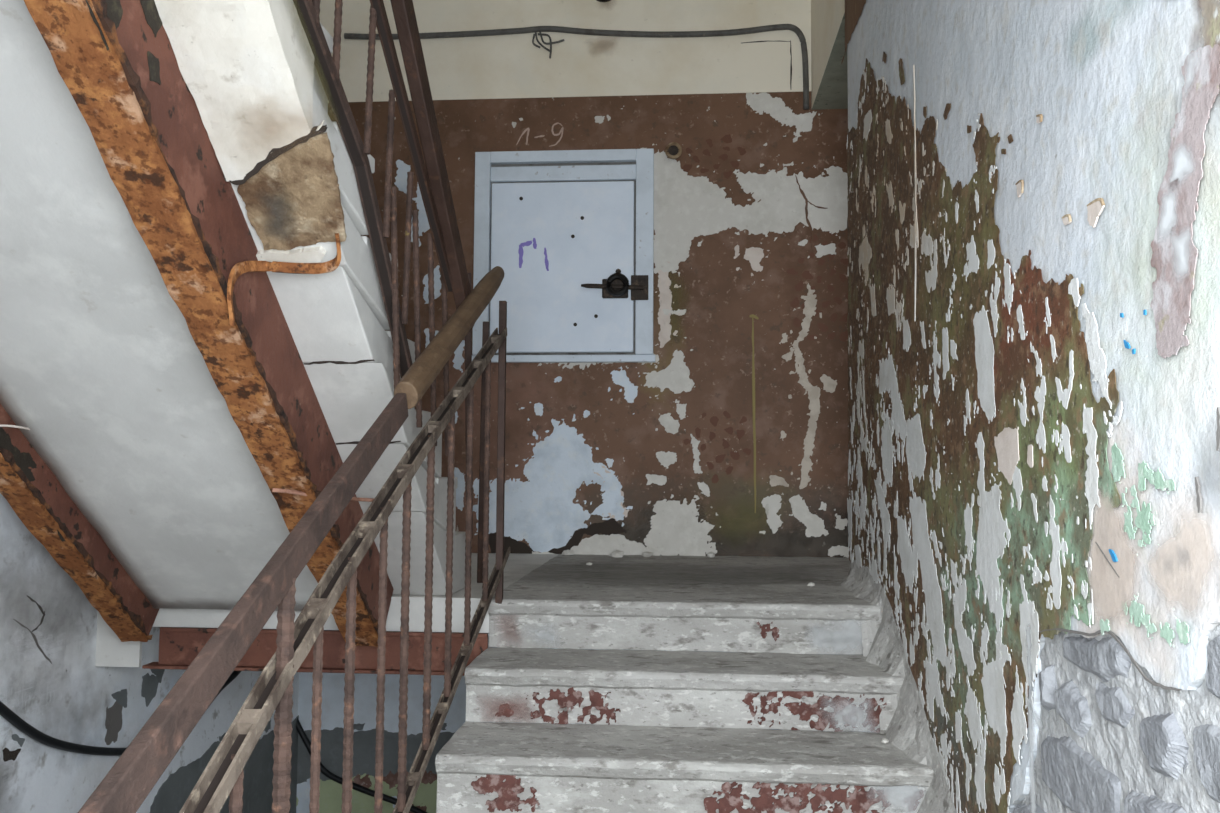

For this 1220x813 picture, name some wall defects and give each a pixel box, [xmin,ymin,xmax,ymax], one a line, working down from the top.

peeling [841,0,866,63]
rust [91,0,322,498]
spalling [237,132,347,263]
peeling [454,44,1220,813]
crack [13,595,52,664]
rust [0,446,153,640]
rust [356,578,378,634]
spalling [104,669,165,745]